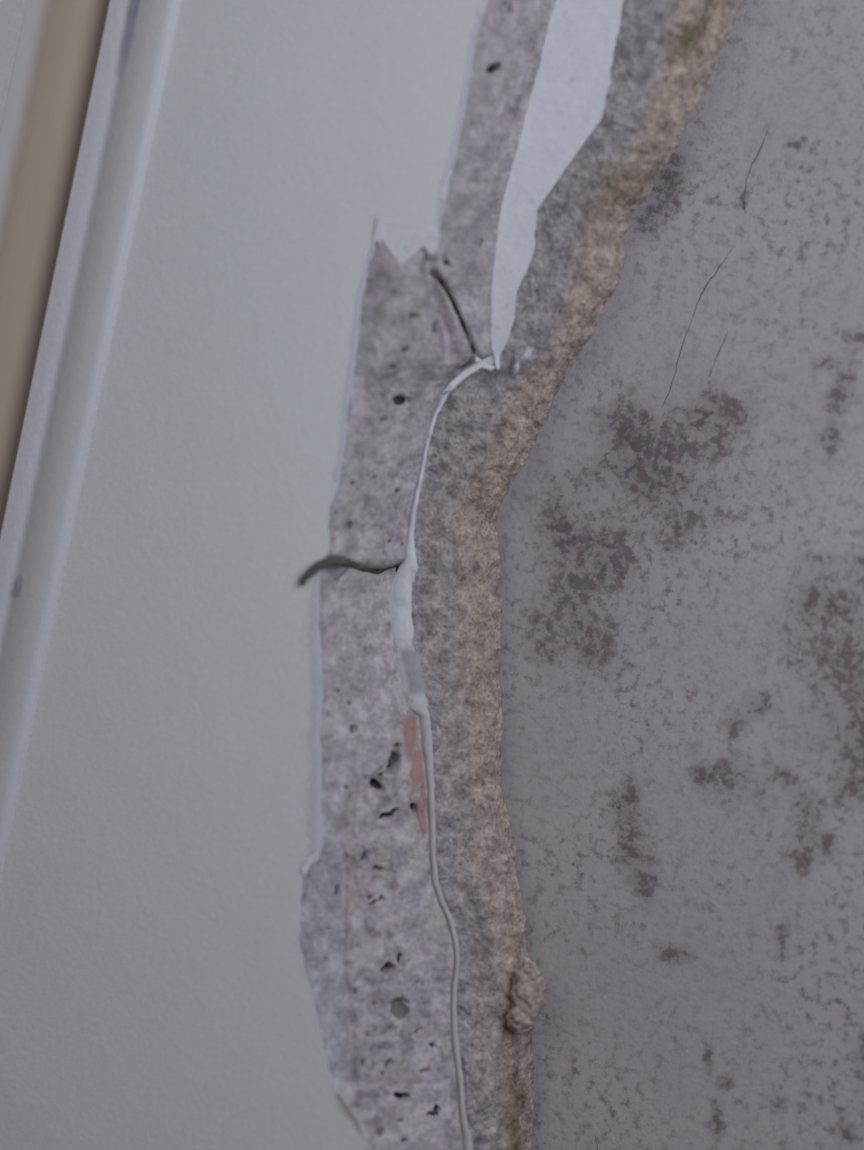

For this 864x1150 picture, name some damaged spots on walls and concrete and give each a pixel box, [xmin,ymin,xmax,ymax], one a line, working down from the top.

water stain [608,398,743,500]
spalling [299,0,738,1150]
water stain [537,506,633,664]
water stain [804,588,864,698]